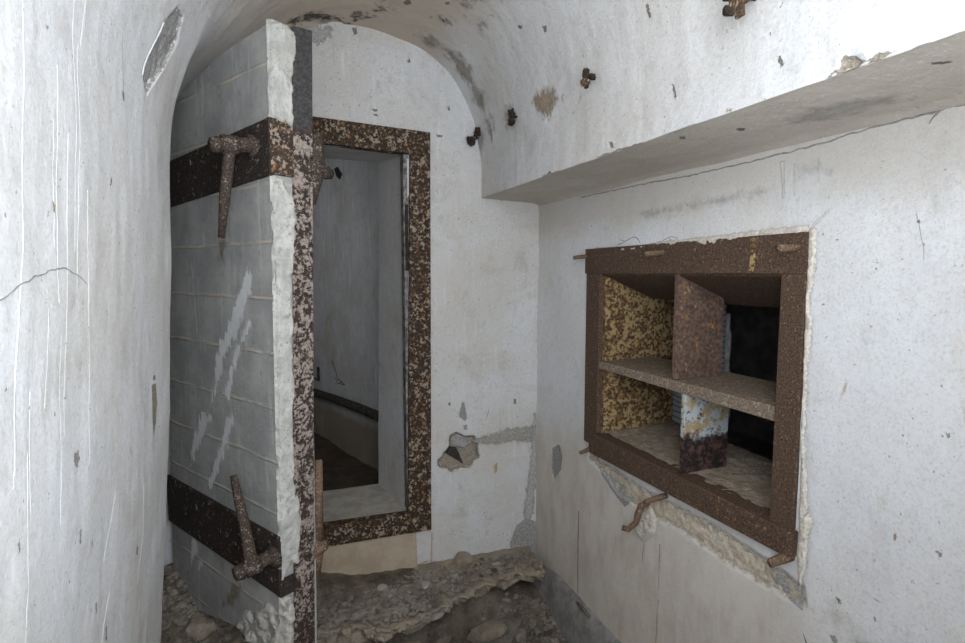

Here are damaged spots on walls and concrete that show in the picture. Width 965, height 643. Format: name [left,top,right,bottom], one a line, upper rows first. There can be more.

spalling [142,8,182,96]
crack [0,267,87,301]
spalling [438,402,480,473]
spalling [589,225,818,610]